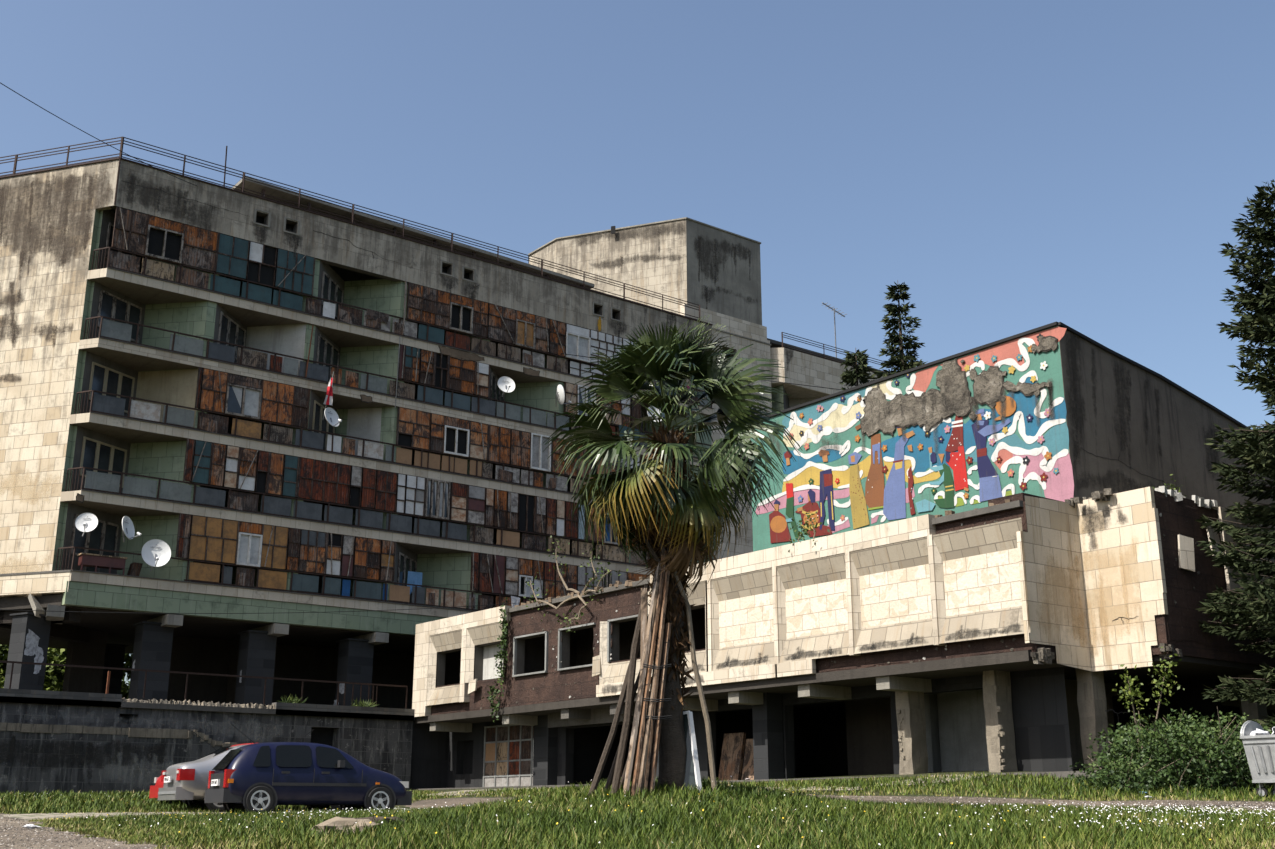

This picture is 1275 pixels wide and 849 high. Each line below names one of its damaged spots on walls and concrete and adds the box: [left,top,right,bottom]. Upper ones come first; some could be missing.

damp [0,173,215,345]
damp [578,223,750,309]
peeling [1031,336,1058,354]
peeling [858,358,1054,450]
damp [1083,507,1125,547]